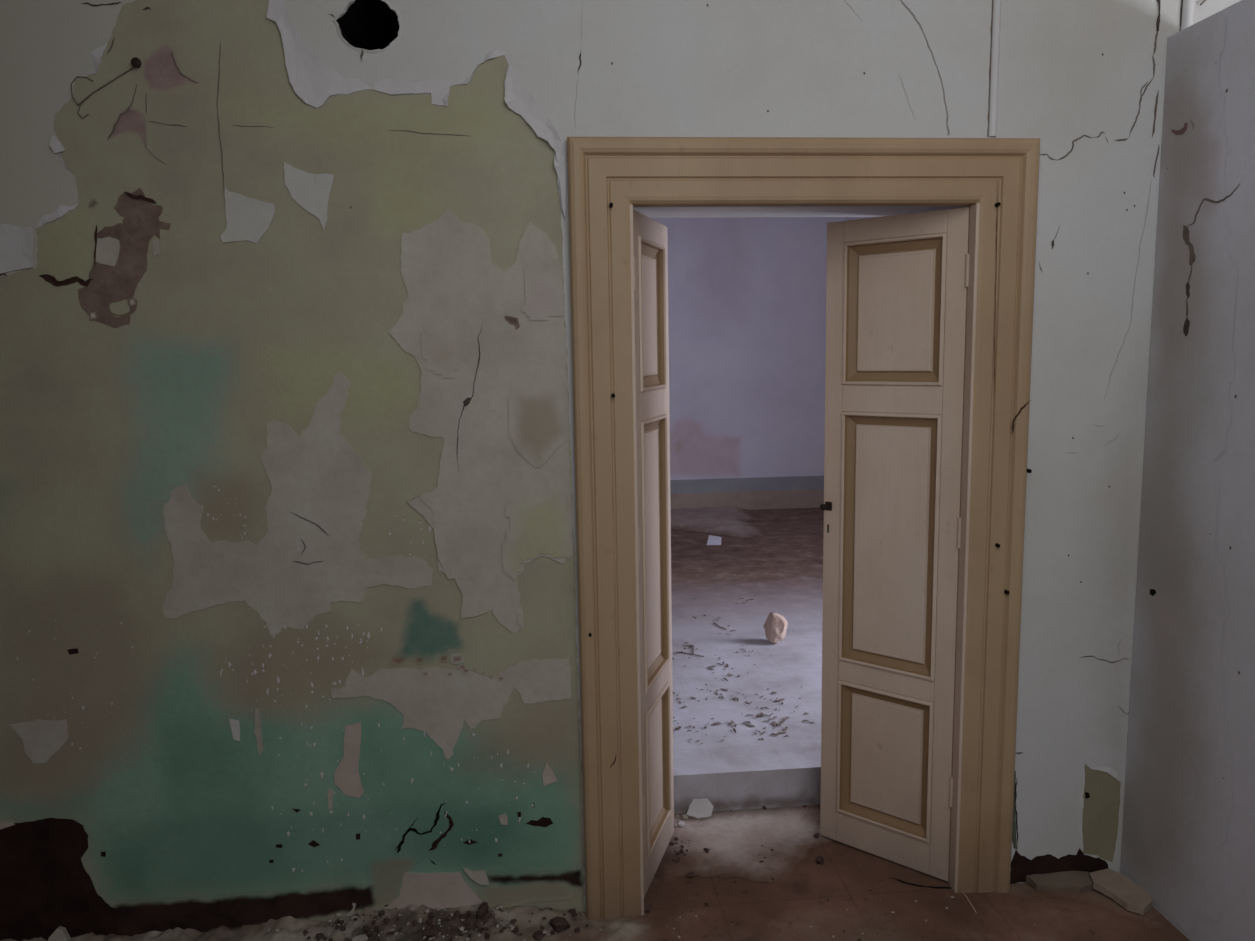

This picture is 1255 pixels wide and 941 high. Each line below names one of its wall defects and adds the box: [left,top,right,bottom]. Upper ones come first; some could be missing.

crack [574,0,583,130]
crack [900,0,950,135]
crack [1040,0,1183,453]
crack [1183,184,1240,336]
flaking render [0,818,117,941]
crack [395,802,454,865]
peeling [1010,763,1121,884]